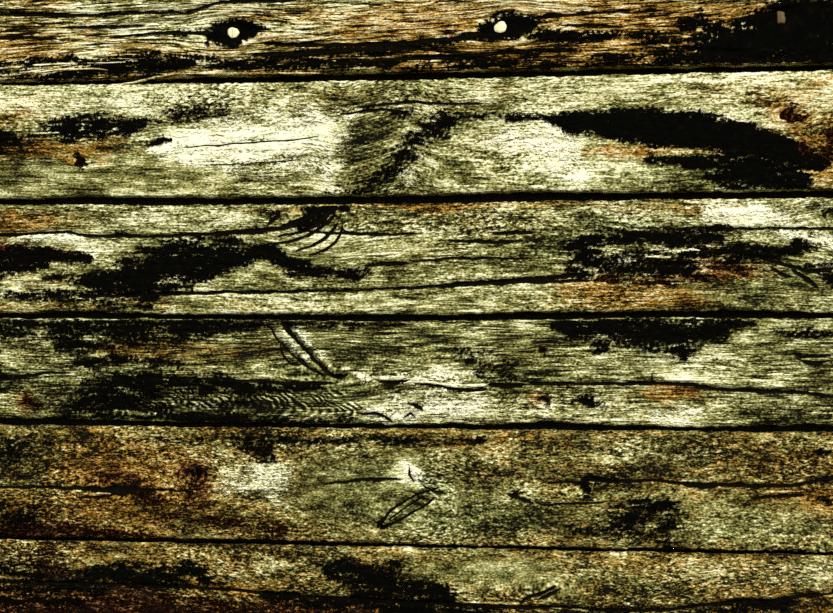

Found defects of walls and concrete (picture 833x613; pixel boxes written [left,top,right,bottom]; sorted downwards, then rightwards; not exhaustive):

leakage [0,0,833,81]
leakage [318,100,833,195]
leakage [560,221,833,288]
leakage [0,205,406,424]
leakage [549,317,757,362]
leakage [772,325,833,339]
leakage [156,435,204,444]
leakage [228,433,487,464]
crack [507,476,833,505]
crack [0,580,833,612]